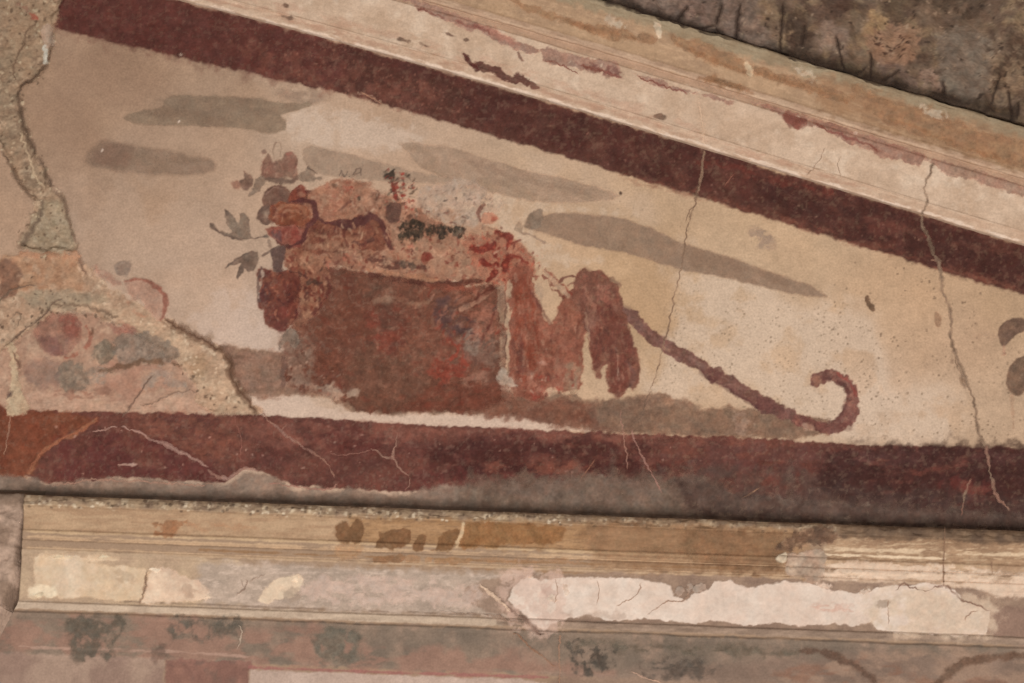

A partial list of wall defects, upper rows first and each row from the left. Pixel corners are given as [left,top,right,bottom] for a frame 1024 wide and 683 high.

crack [623,151,732,487]
crack [921,163,1009,510]
damp [0,473,1024,574]
peeling [29,555,210,604]
peeling [509,576,990,637]